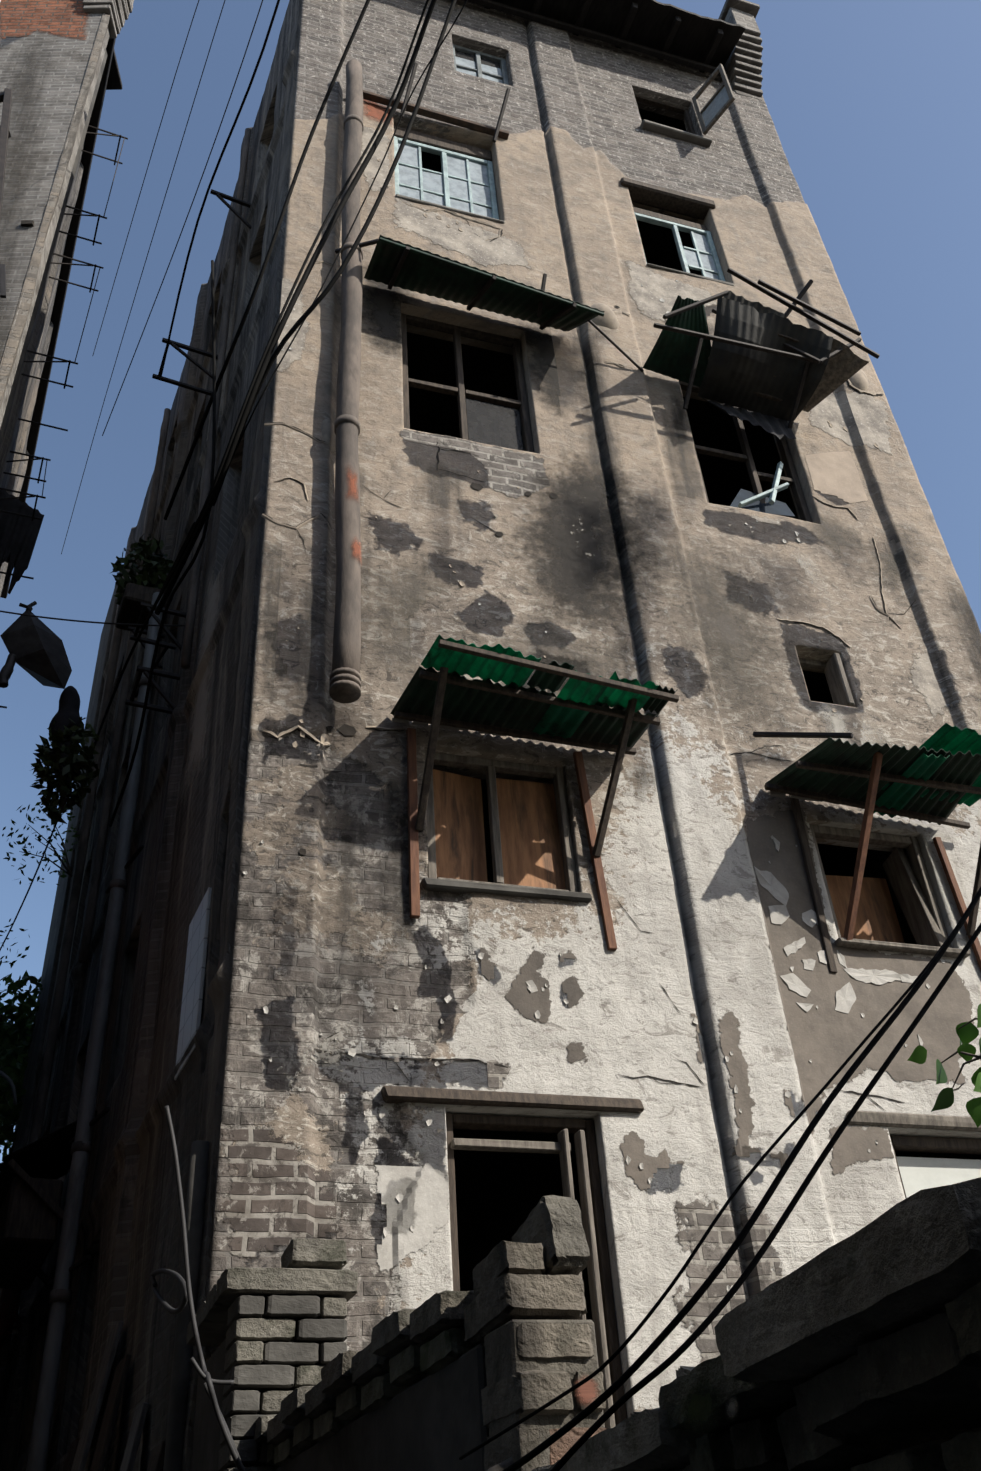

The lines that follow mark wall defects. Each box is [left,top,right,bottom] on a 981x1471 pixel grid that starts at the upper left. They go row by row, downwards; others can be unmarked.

spalling [361,126,531,269]
crack [812,495,916,628]
crack [777,618,851,647]
peeling [478,947,498,981]
peeling [505,947,584,1023]
peeling [745,810,974,1175]
peeling [718,1010,794,1168]
peeling [620,1131,685,1191]
flaking render [672,1195,783,1378]